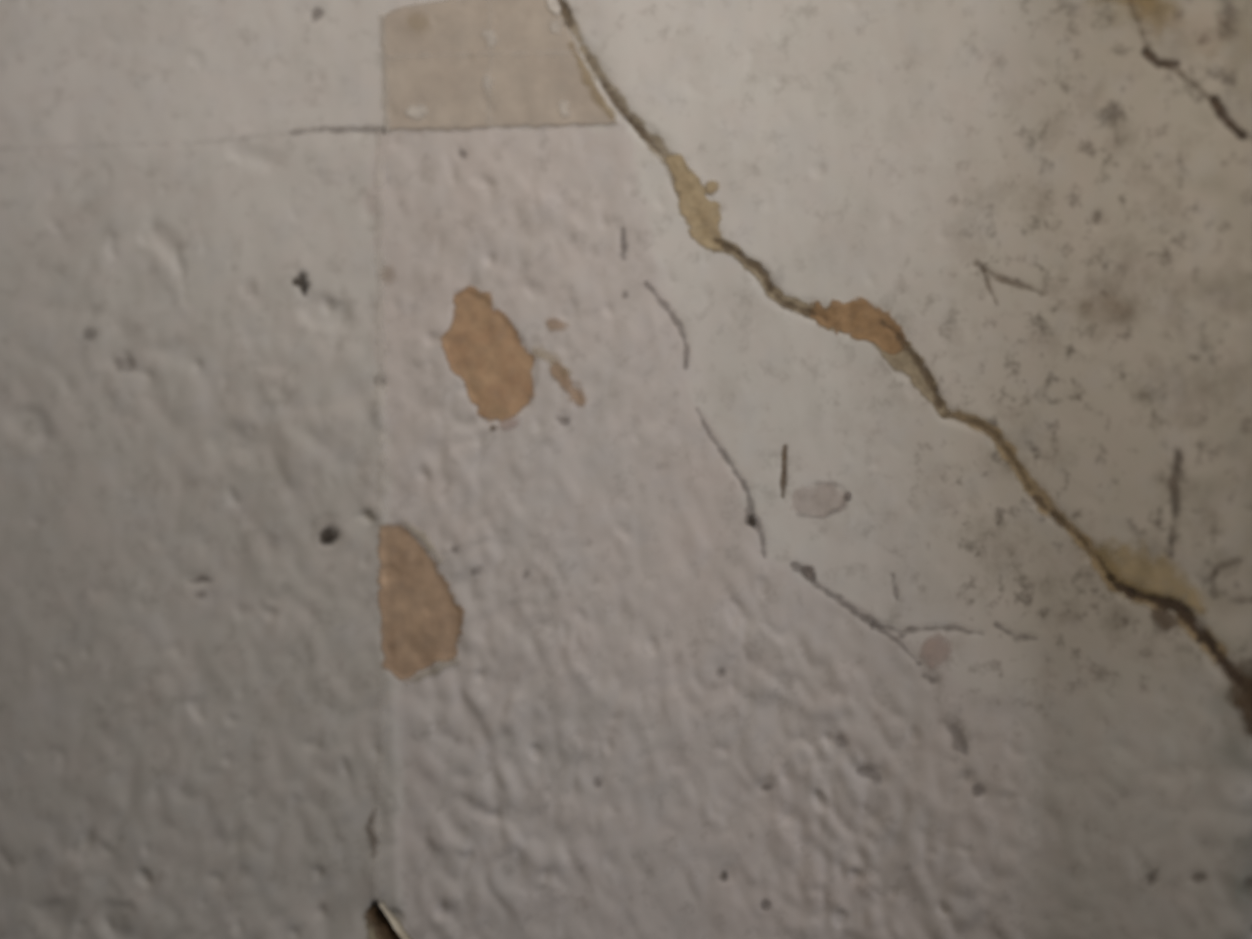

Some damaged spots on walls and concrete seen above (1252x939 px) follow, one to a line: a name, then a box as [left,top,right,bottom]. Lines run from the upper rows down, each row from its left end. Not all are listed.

peeling [441,287,534,429]
peeling [551,363,585,405]
crack [547,0,1247,685]
peeling [378,525,464,680]
flaking render [368,905,400,939]